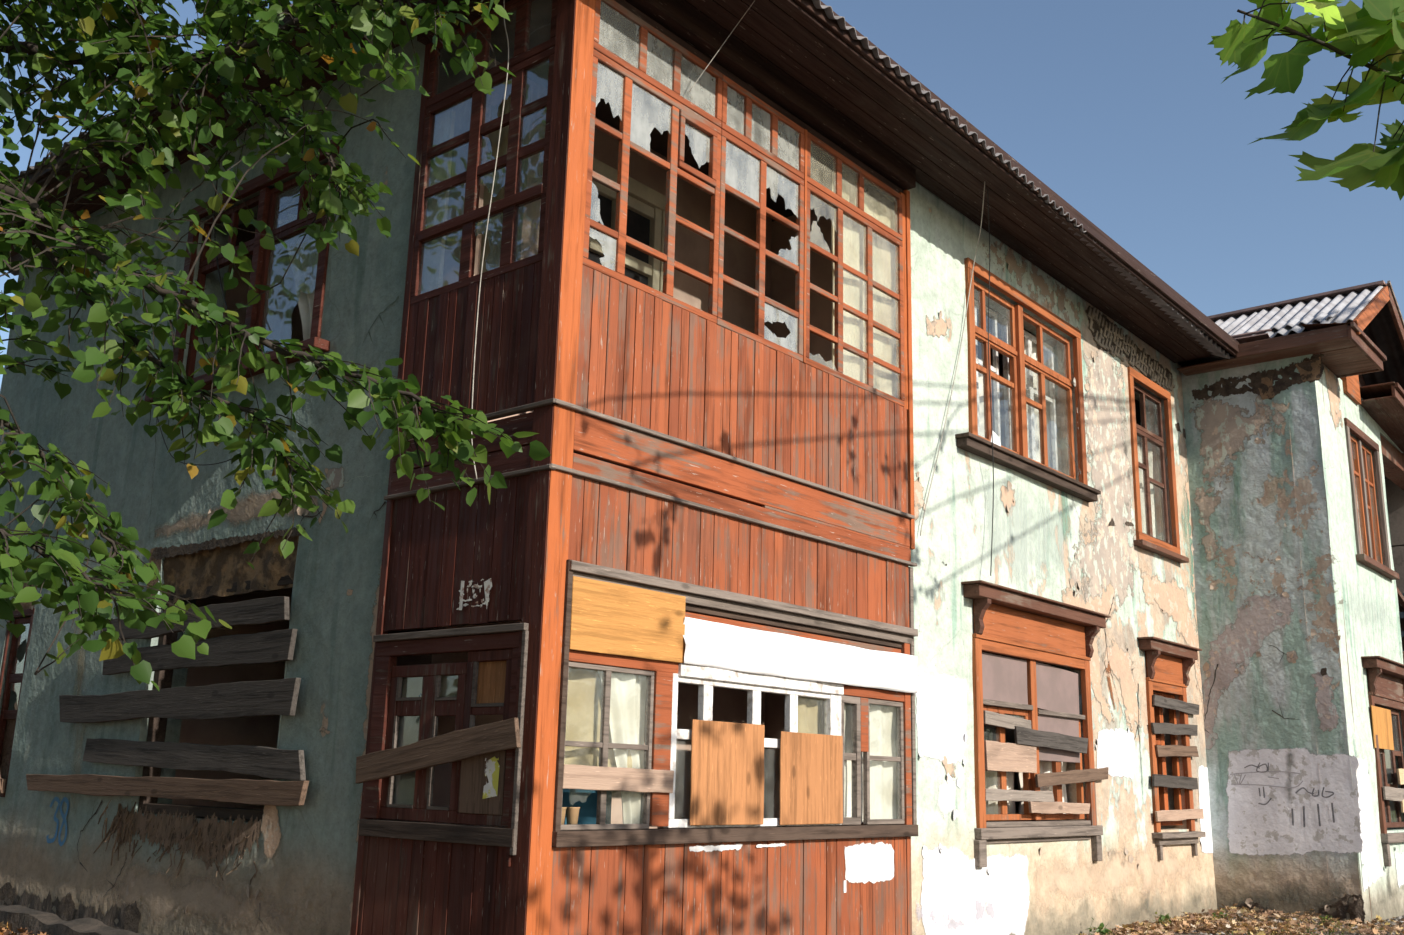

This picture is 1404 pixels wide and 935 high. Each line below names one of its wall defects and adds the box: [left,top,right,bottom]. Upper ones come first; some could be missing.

peeling [146,466,344,596]
peeling [983,241,1343,750]